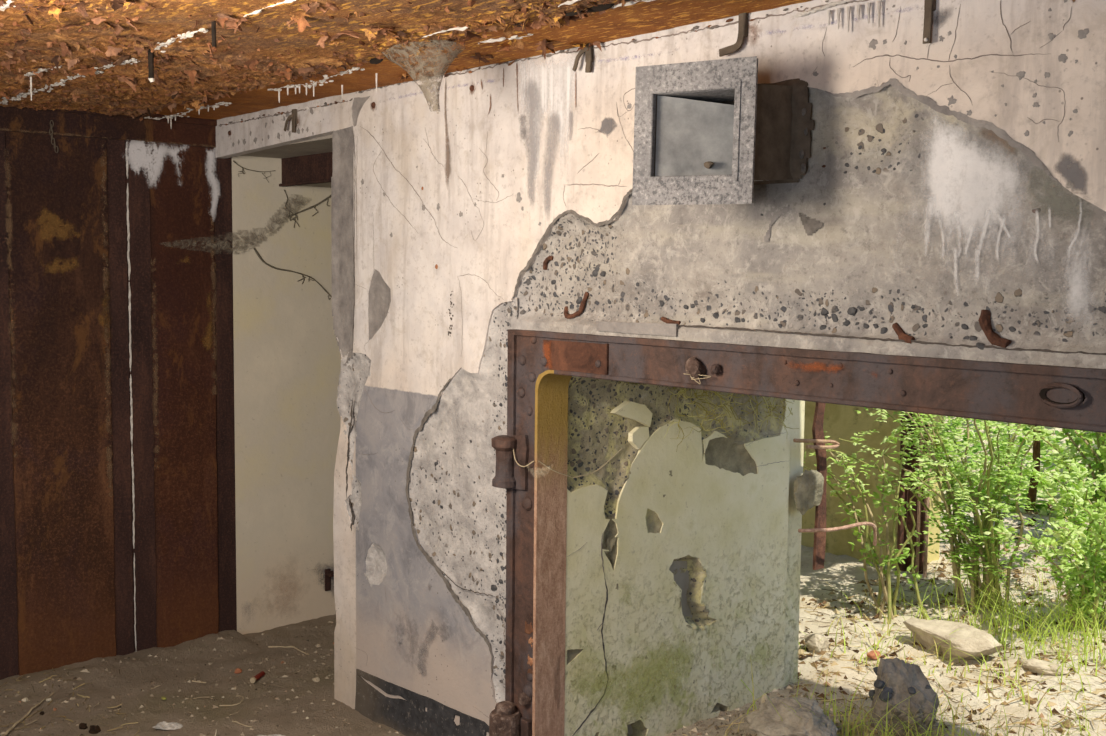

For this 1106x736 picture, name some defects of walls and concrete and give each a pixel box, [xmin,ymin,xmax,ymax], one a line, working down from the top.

water stain [206,150,220,218]
flaking render [0,0,869,533]
water stain [520,62,573,208]
crack [855,1,1072,142]
water stain [927,118,1018,277]
water stain [1056,156,1086,191]
water stain [1069,211,1085,310]
water stain [125,140,186,648]
spalling [405,71,1106,703]
crack [569,533,609,735]